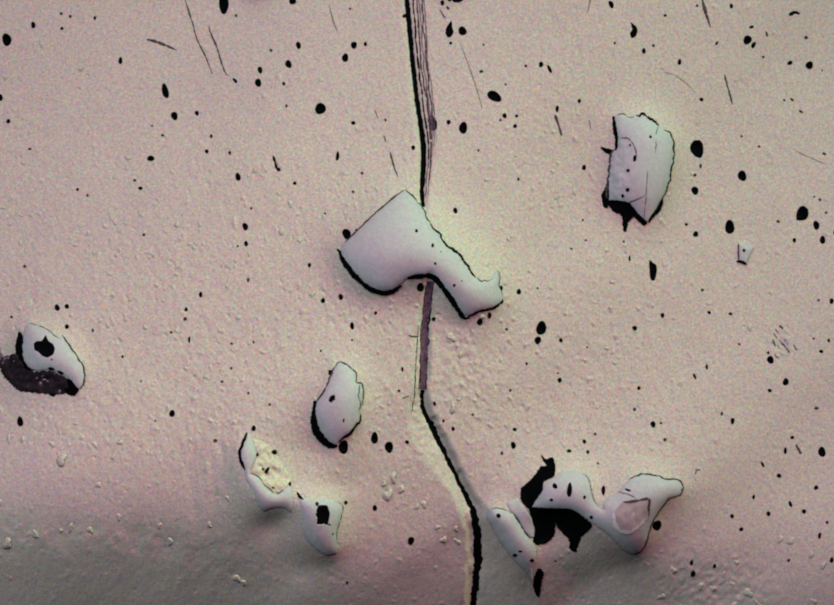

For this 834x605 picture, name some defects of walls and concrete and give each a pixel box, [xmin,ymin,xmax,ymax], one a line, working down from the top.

spalling [445,21,467,45]
crack [402,0,437,207]
peeling [601,112,675,243]
peeling [0,323,86,397]
peeling [310,362,364,454]
crack [408,281,483,605]
peeling [486,454,684,597]